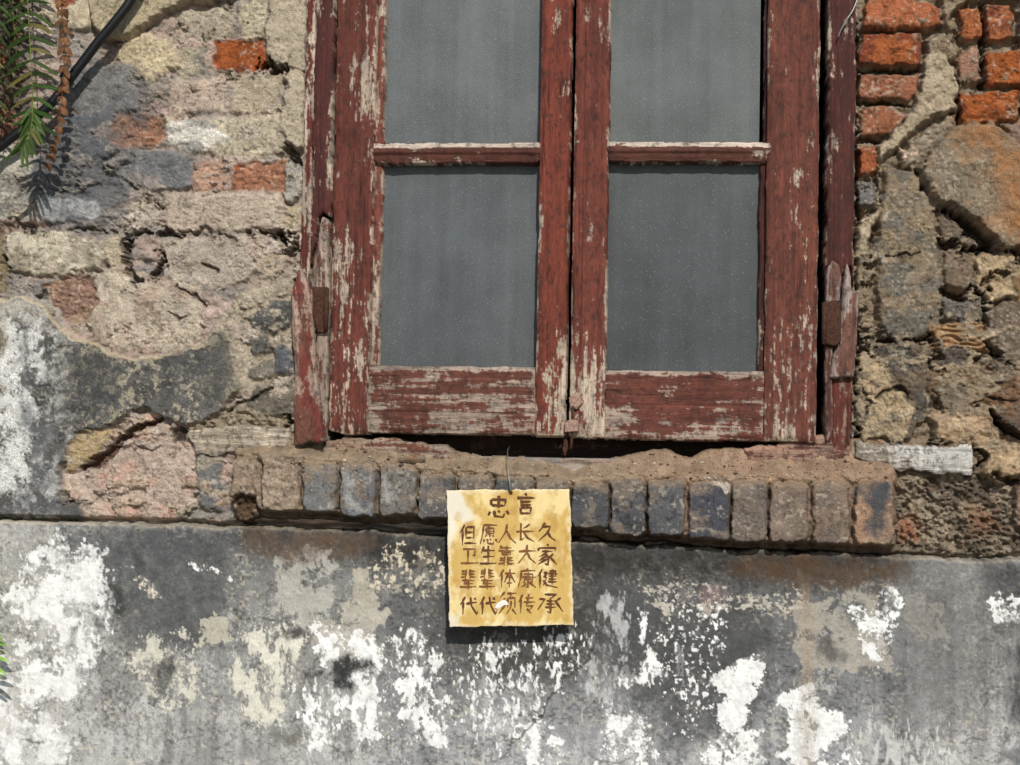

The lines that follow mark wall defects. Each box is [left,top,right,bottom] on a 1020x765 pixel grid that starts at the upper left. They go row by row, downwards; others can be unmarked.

peeling [88,0,235,43]
spalling [210,36,305,77]
spalling [0,100,30,140]
spalling [229,155,289,195]
spalling [119,225,187,289]
spalling [0,271,798,765]
leakage [40,519,277,697]
leakage [277,622,308,642]
leakage [300,527,796,765]
crack [494,600,599,765]
leakage [267,719,312,749]
crack [585,751,634,765]